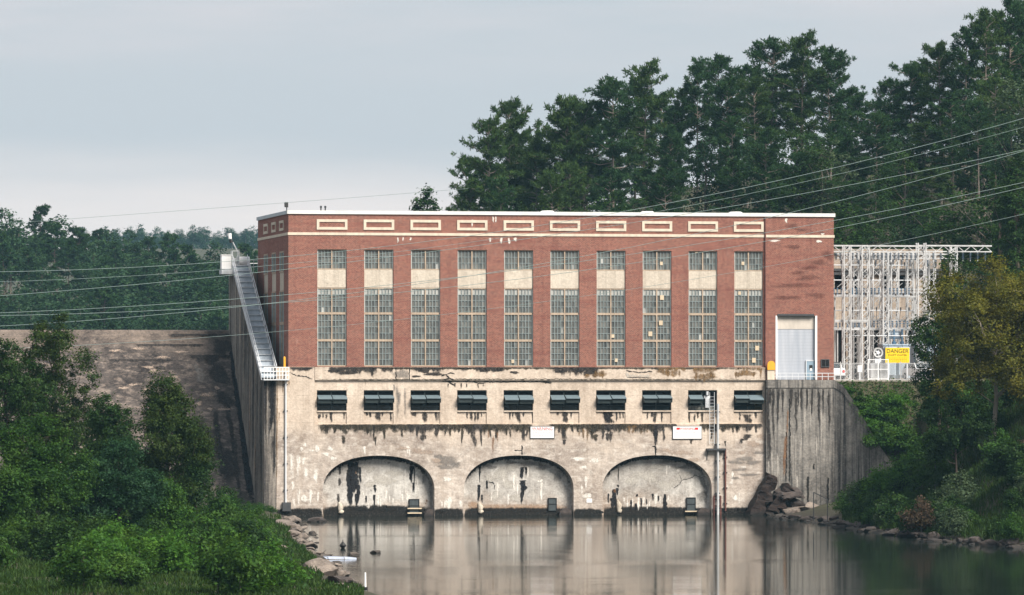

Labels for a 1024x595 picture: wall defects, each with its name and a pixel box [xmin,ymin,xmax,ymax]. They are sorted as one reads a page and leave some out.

leakage [107,320,831,517]